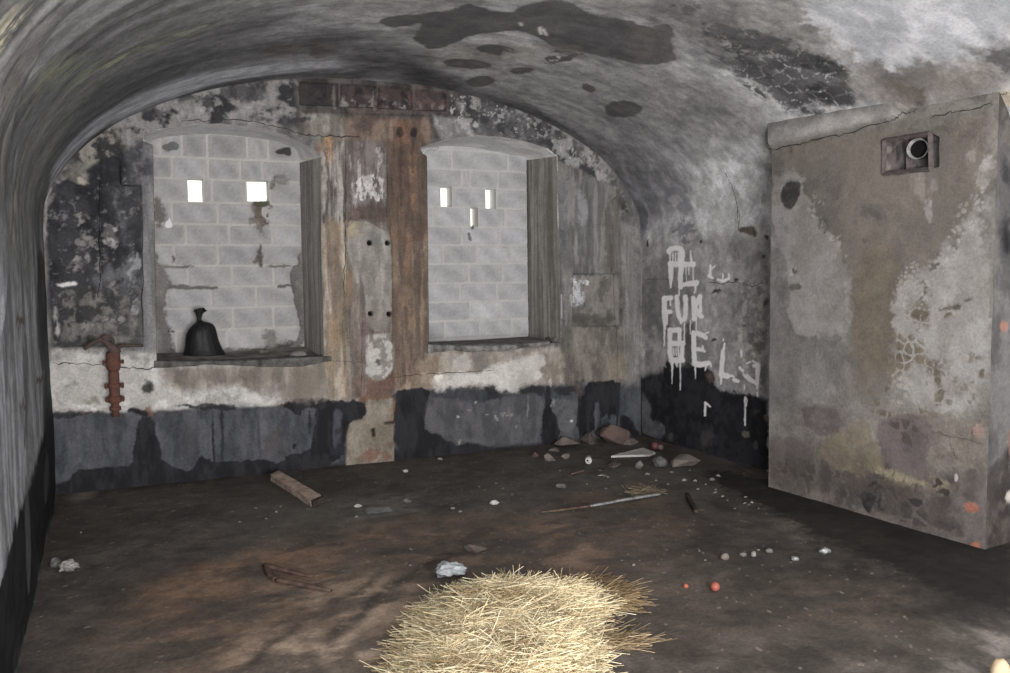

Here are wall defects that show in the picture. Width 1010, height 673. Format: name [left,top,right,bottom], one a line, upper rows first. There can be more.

leakage [497,44,554,67]
crack [770,92,1009,150]
crack [185,119,360,288]
corrosion [322,81,451,464]
flaking render [866,190,986,422]
crack [56,344,154,370]
leakage [154,363,344,462]
peeling [423,349,579,449]
leakage [695,127,1010,639]